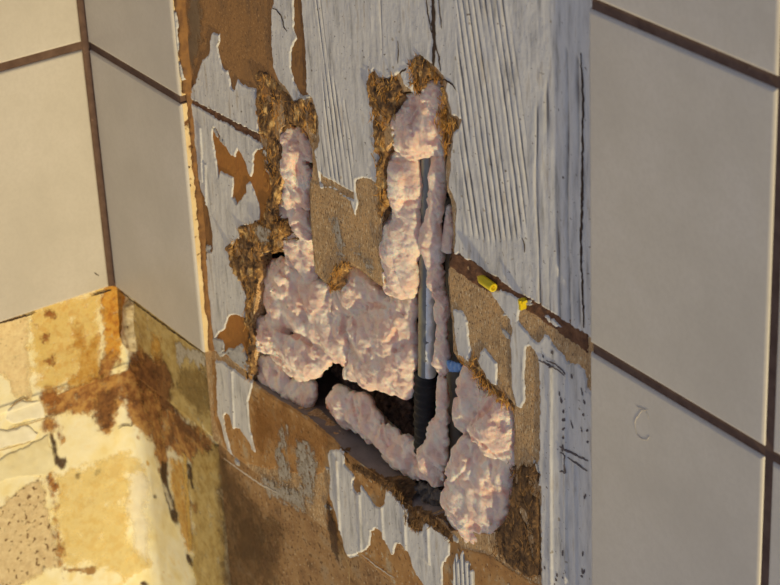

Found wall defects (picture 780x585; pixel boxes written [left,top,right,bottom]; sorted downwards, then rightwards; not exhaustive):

crack [426,0,456,90]
peeling [213,128,272,245]
peeling [309,177,386,287]
crack [578,53,586,328]
spalling [0,314,61,585]
leakage [25,288,102,389]
leakage [133,300,227,585]
peeling [175,314,388,513]
peeling [448,254,588,473]
leakage [52,452,150,581]
leakage [326,501,339,563]
peeling [358,528,423,585]